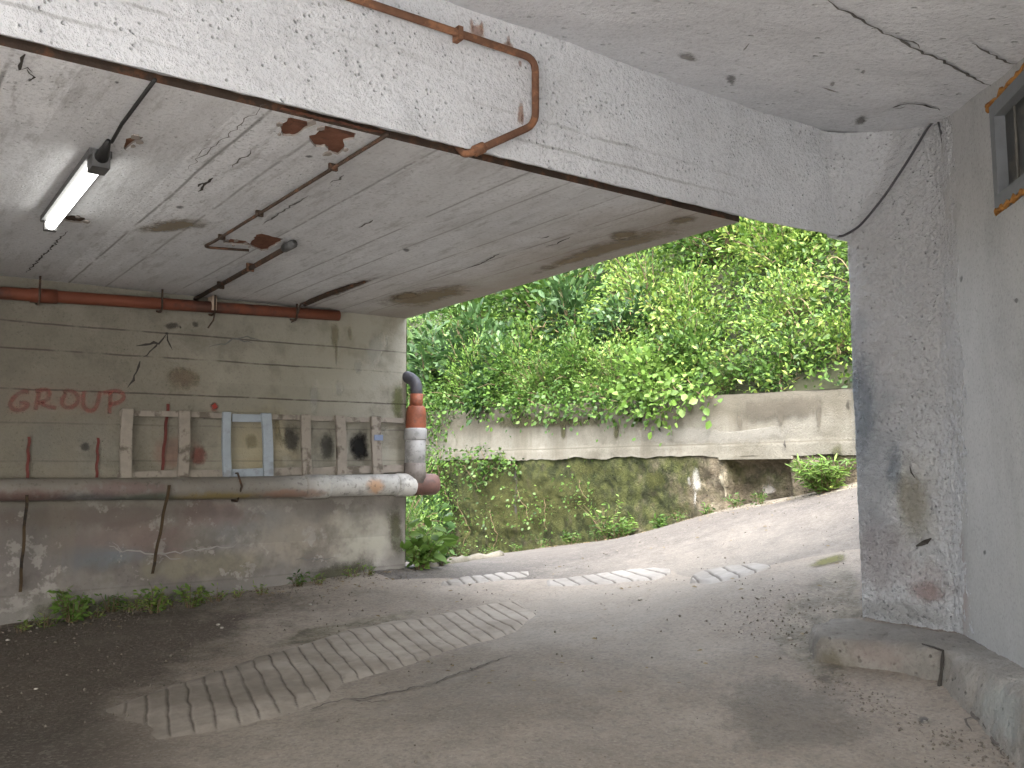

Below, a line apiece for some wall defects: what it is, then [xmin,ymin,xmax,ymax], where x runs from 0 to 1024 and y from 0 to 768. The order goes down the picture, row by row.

crack [828,0,991,86]
crack [18,54,36,81]
spalling [124,134,144,150]
crack [187,104,266,192]
spalling [276,107,383,157]
water stain [143,221,202,232]
spalling [223,234,282,251]
water stain [389,286,460,304]
crack [127,333,172,388]
water stain [285,430,299,449]
water stain [322,436,333,458]
water stain [350,432,368,460]